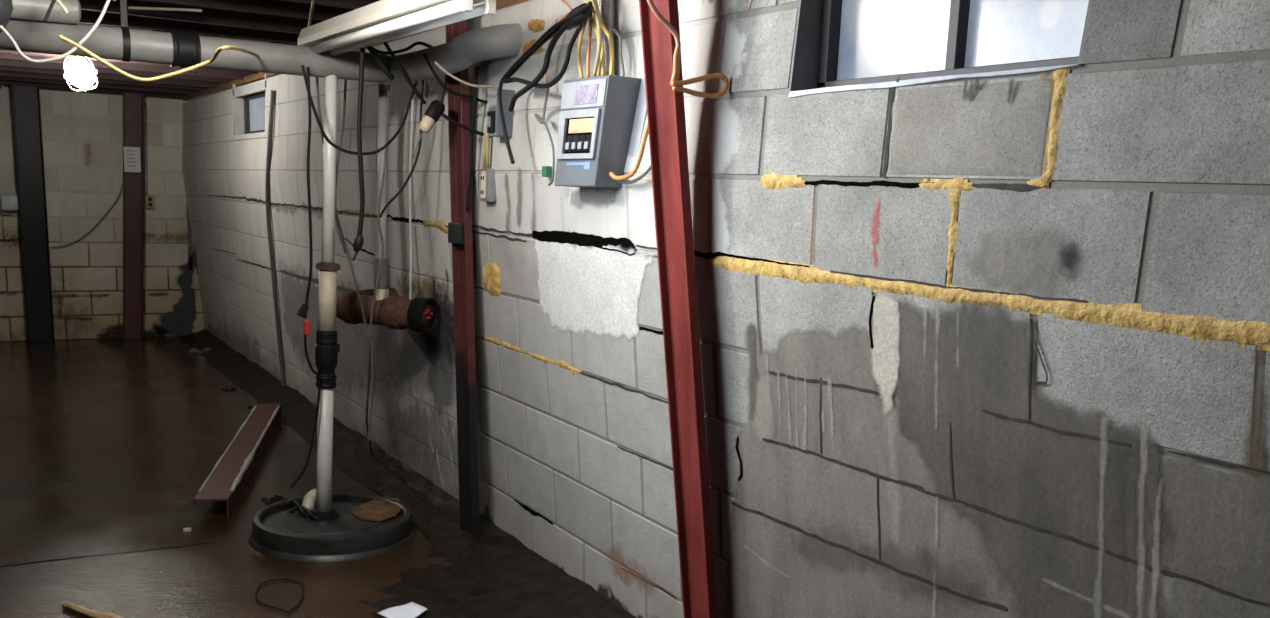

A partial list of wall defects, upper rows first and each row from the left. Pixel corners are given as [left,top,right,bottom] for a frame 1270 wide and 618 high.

crack [215,249,271,270]
damp [399,271,448,300]
crack [206,195,658,258]
crack [694,68,1270,426]
crack [902,424,990,512]
damp [727,302,1270,618]